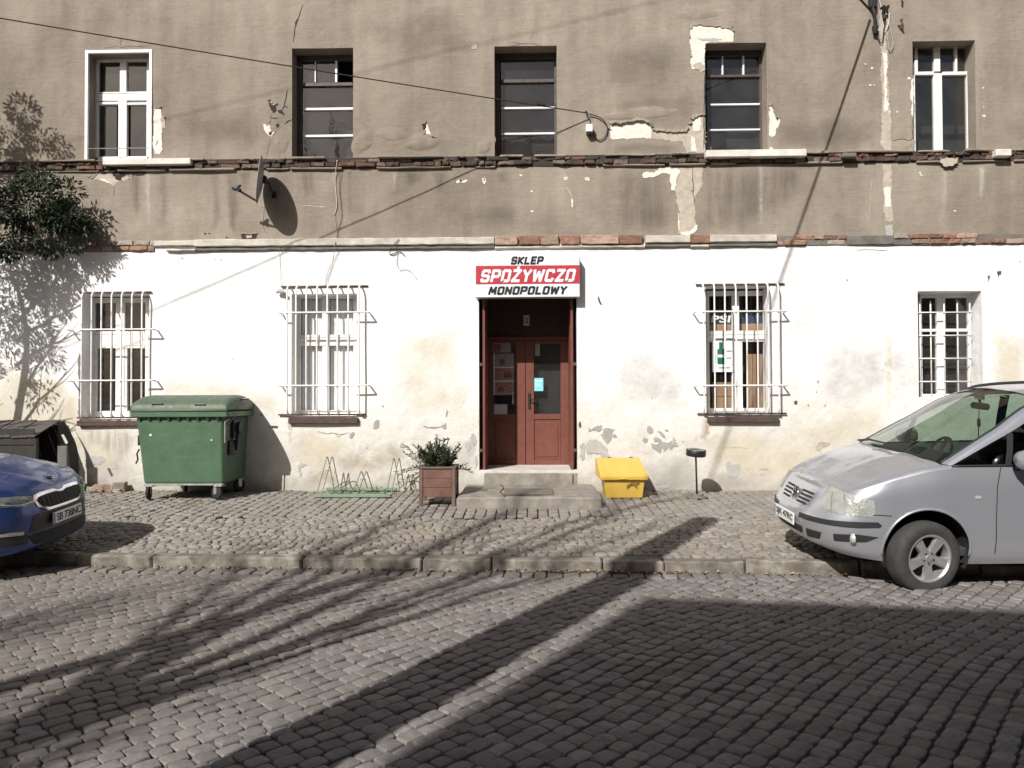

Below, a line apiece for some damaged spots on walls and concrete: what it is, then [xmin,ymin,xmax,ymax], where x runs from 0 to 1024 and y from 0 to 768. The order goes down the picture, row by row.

flaking render [689,23,734,72]
flaking render [152,106,165,154]
flaking render [263,99,285,136]
flaking render [768,103,781,149]
flaking render [86,171,146,186]
flaking render [606,112,710,244]
peeling [579,422,617,461]
peeling [642,426,684,453]